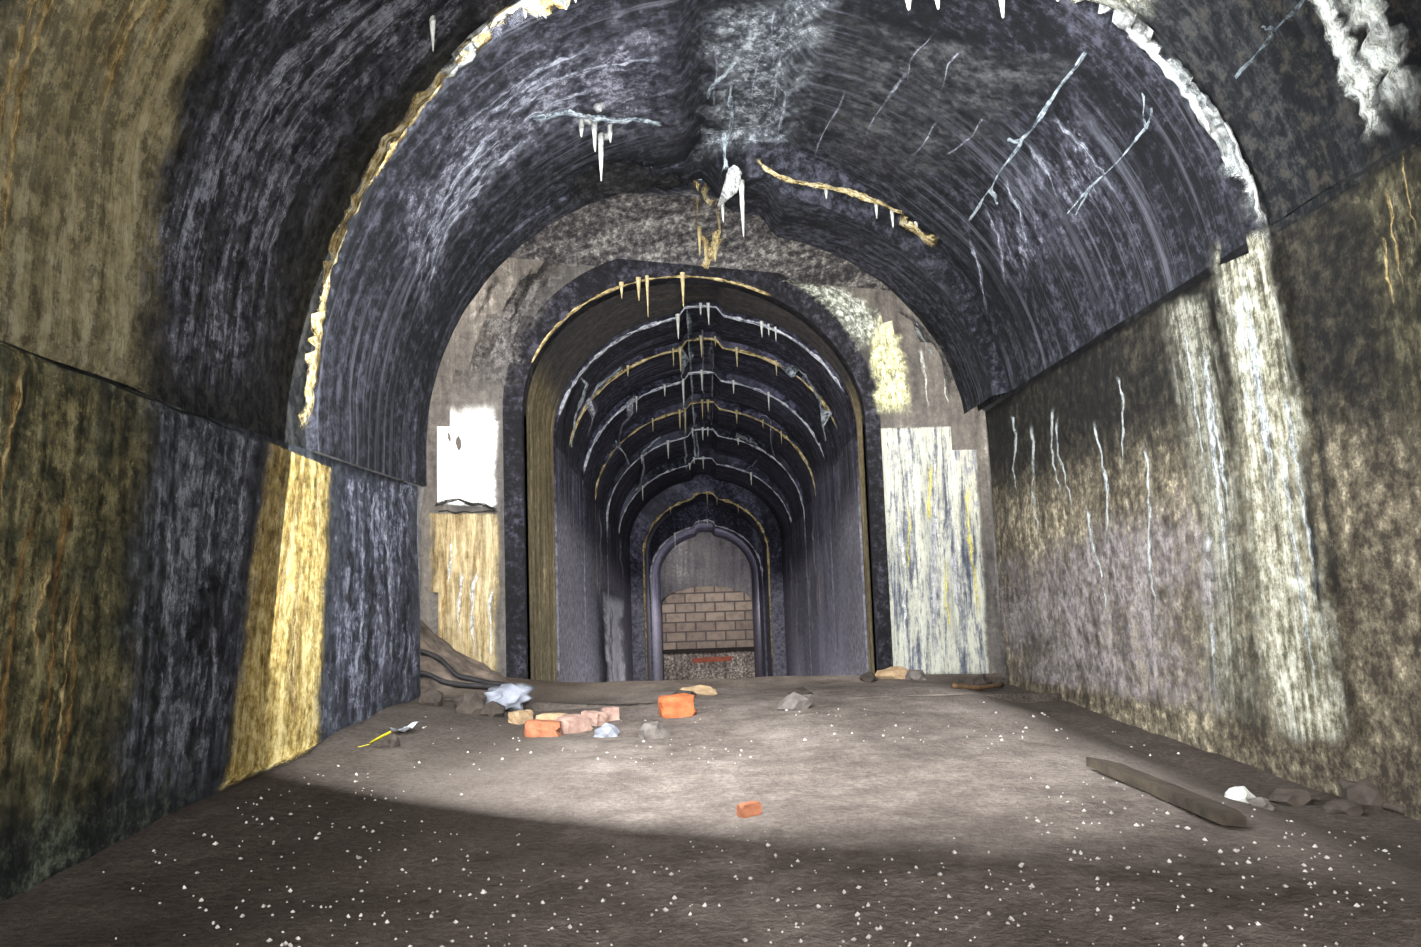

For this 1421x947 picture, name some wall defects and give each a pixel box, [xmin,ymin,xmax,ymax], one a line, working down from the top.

water stain [407,36,667,285]
water stain [758,159,935,247]
water stain [818,38,1032,170]
water stain [988,122,1110,268]
water stain [0,0,459,777]
water stain [532,0,845,682]
water stain [788,279,932,410]
water stain [881,235,1343,738]